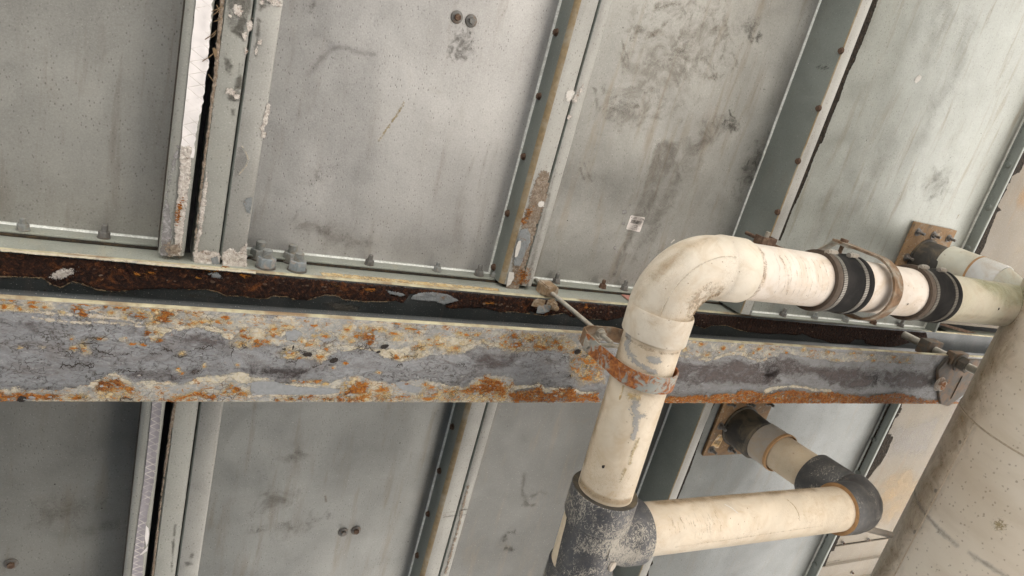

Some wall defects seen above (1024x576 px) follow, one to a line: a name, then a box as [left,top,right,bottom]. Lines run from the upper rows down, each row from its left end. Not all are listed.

rust [506,170,550,289]
rust [0,299,89,317]
peeling [0,299,585,363]
rust [104,305,484,369]
peeling [681,325,915,364]
rust [0,375,256,402]
peeling [0,369,514,402]
rust [275,333,604,403]
rust [664,378,952,404]